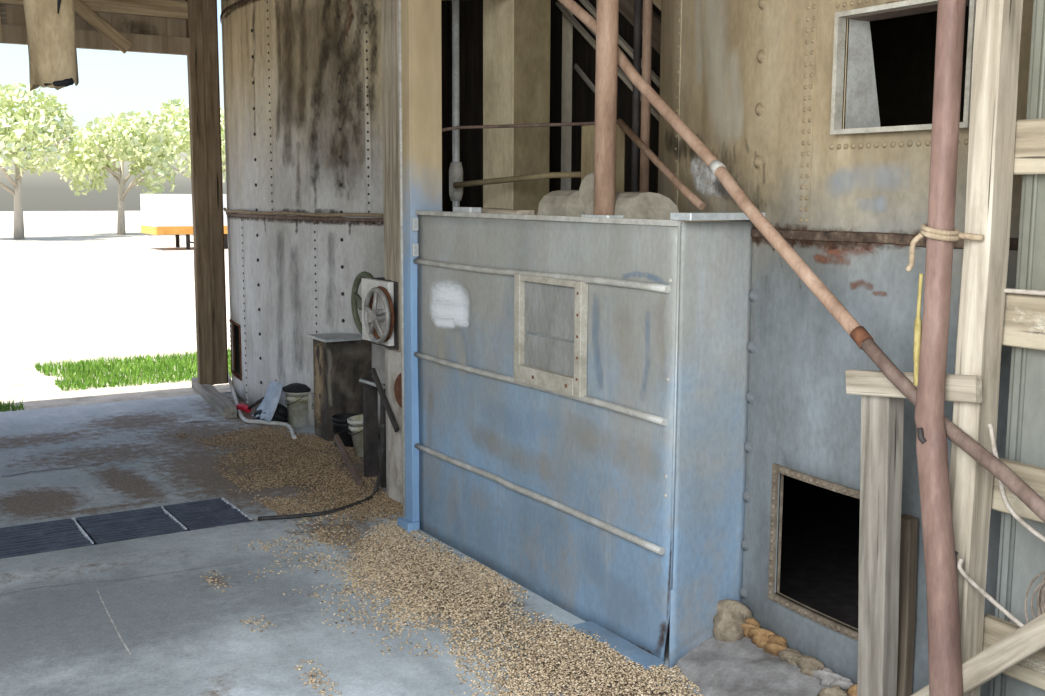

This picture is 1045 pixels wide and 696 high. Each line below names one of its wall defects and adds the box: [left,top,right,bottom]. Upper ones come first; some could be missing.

water stain [276,0,377,183]
rust [775,225,883,263]